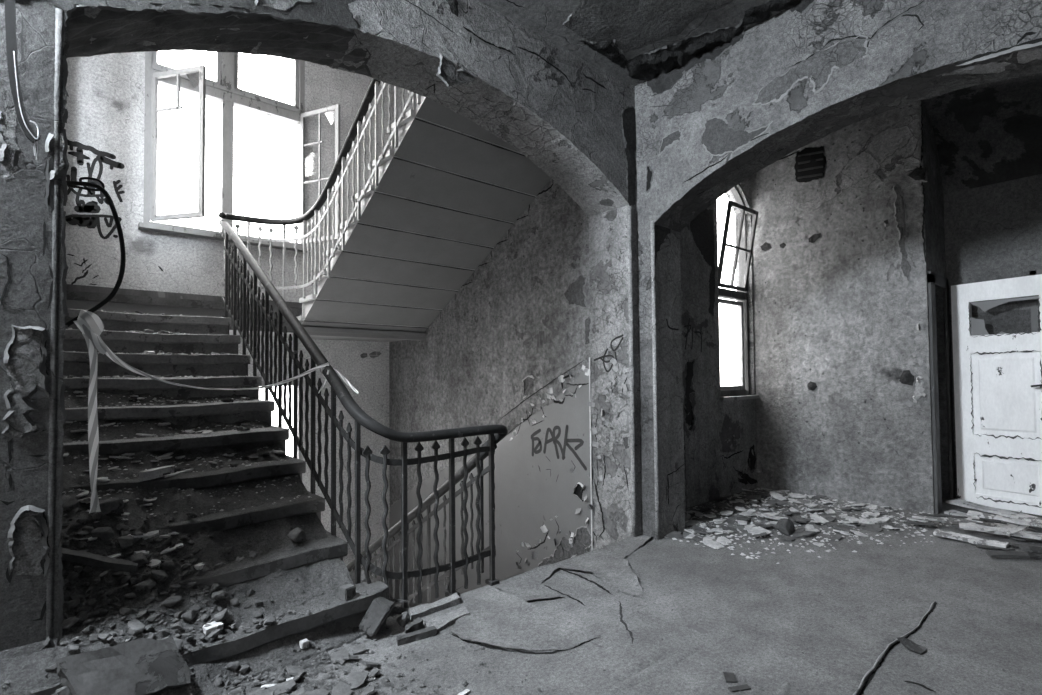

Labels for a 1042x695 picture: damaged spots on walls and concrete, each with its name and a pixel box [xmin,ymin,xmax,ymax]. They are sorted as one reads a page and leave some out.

flaking render [64,0,372,77]
crack [406,0,606,93]
flaking render [1,325,51,439]
flaking render [509,365,591,441]
flaking render [587,358,630,460]
flaking render [7,505,50,576]
flaking render [516,468,603,570]